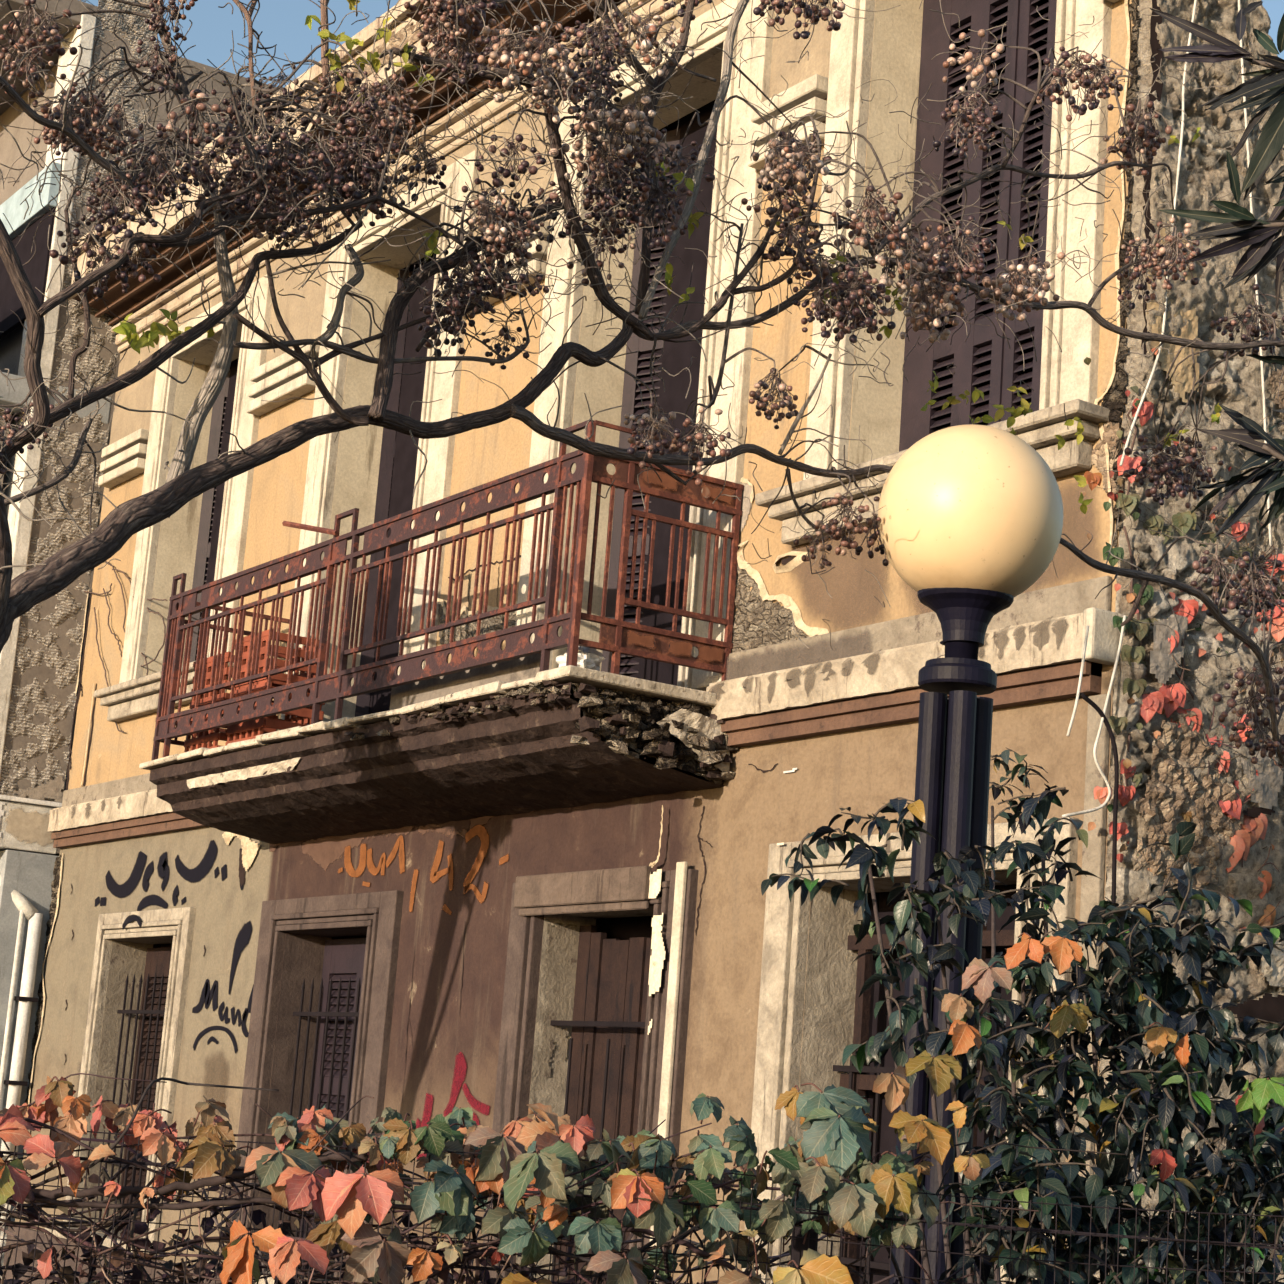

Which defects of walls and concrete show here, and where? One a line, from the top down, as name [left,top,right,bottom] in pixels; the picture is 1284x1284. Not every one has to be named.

flaking render [1090,0,1140,548]
spalling [1269,367,1284,409]
corrosion [643,470,677,490]
corrosion [701,484,733,504]
flaking render [731,477,829,653]
corrosion [627,631,724,662]
damp [978,617,1067,659]
spalling [343,680,738,781]
crack [649,805,663,868]
peeling [648,869,662,899]
crack [695,806,713,933]
peeling [648,913,666,996]